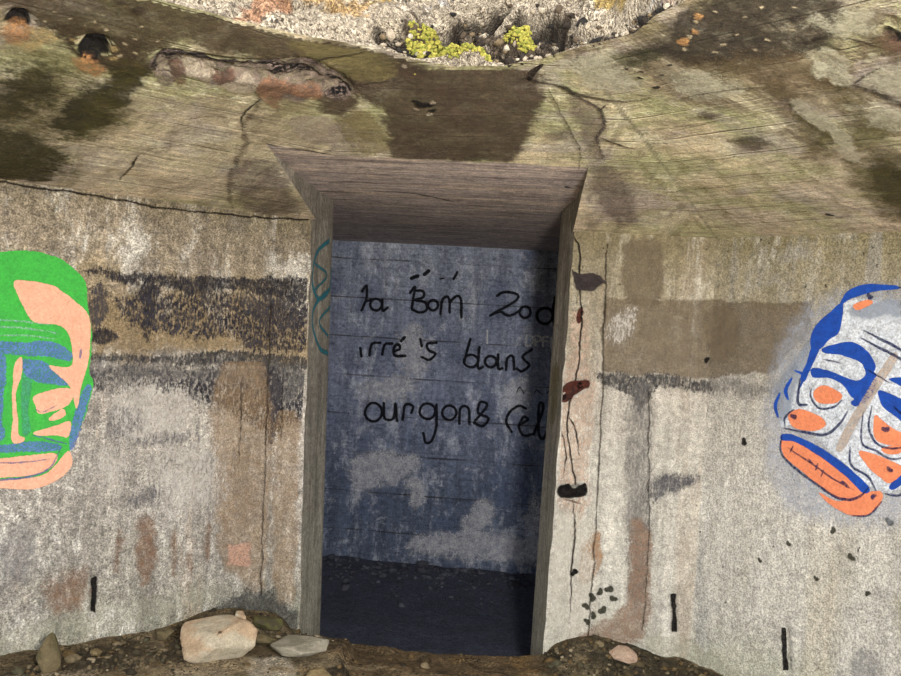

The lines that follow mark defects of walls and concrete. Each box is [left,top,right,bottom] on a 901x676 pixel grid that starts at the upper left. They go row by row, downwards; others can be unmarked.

spalling [1,7,57,51]
leakage [0,64,66,181]
spalling [71,33,118,76]
leakage [0,0,547,162]
crack [530,79,650,167]
leakage [560,53,640,93]
leakage [663,52,901,222]
leakage [803,0,901,100]